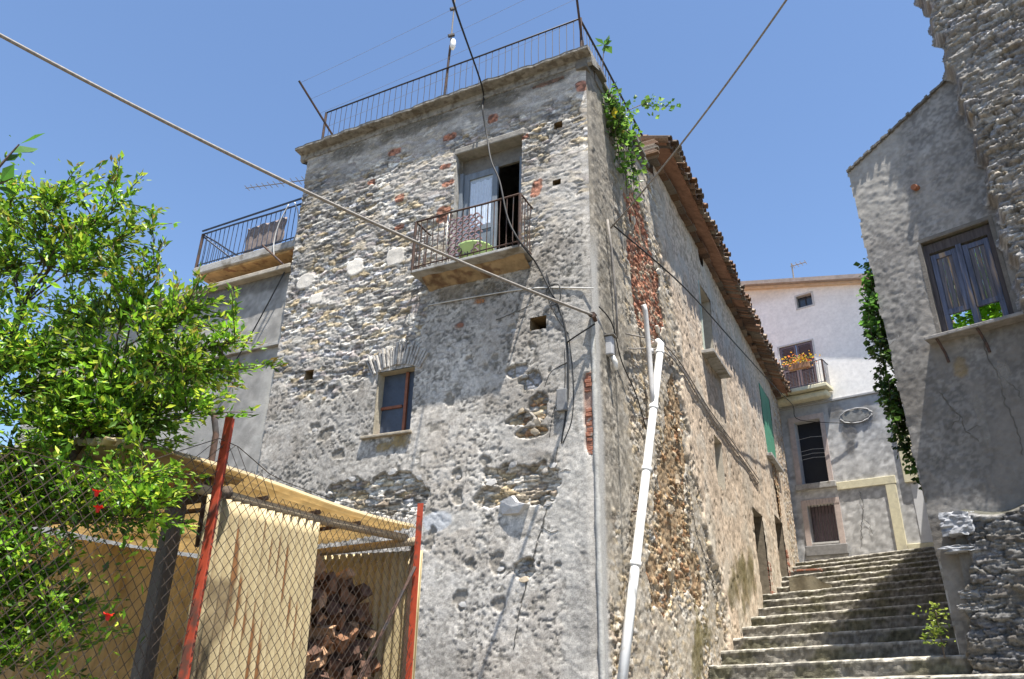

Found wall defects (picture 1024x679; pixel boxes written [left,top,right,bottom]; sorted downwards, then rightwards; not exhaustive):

flaking render [623,191,664,342]
flaking render [507,365,548,439]
flaking render [327,468,430,518]
flaking render [475,461,562,515]